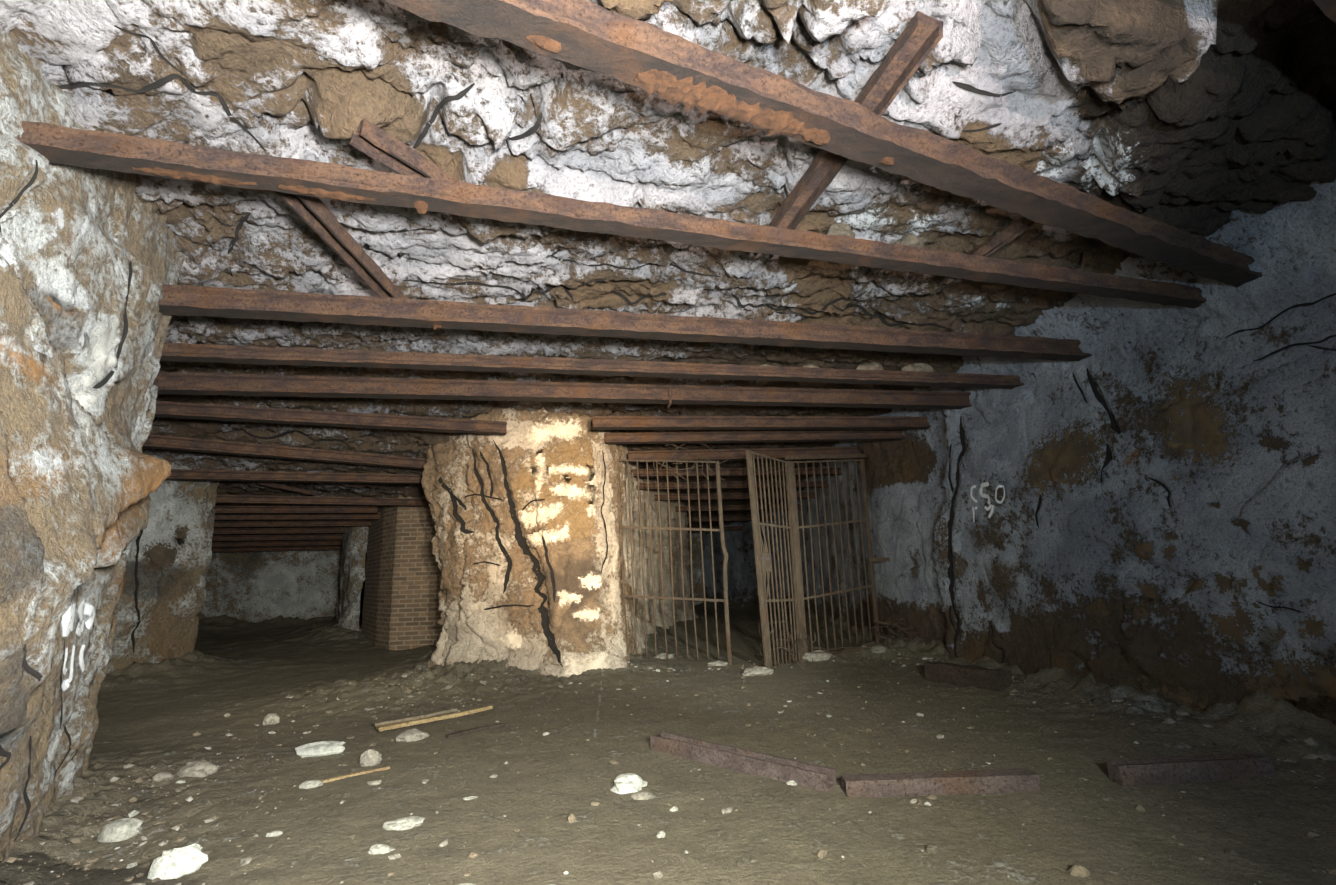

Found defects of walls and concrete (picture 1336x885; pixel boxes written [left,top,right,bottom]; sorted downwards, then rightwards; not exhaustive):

crack [413,83,475,149]
crack [506,113,542,141]
crack [0,160,38,233]
crack [403,255,953,330]
crack [1225,293,1336,361]
crack [229,421,422,454]
crack [438,440,563,667]
crack [600,450,608,574]
crack [947,416,1004,663]
crack [131,530,143,654]
crack [0,639,76,841]